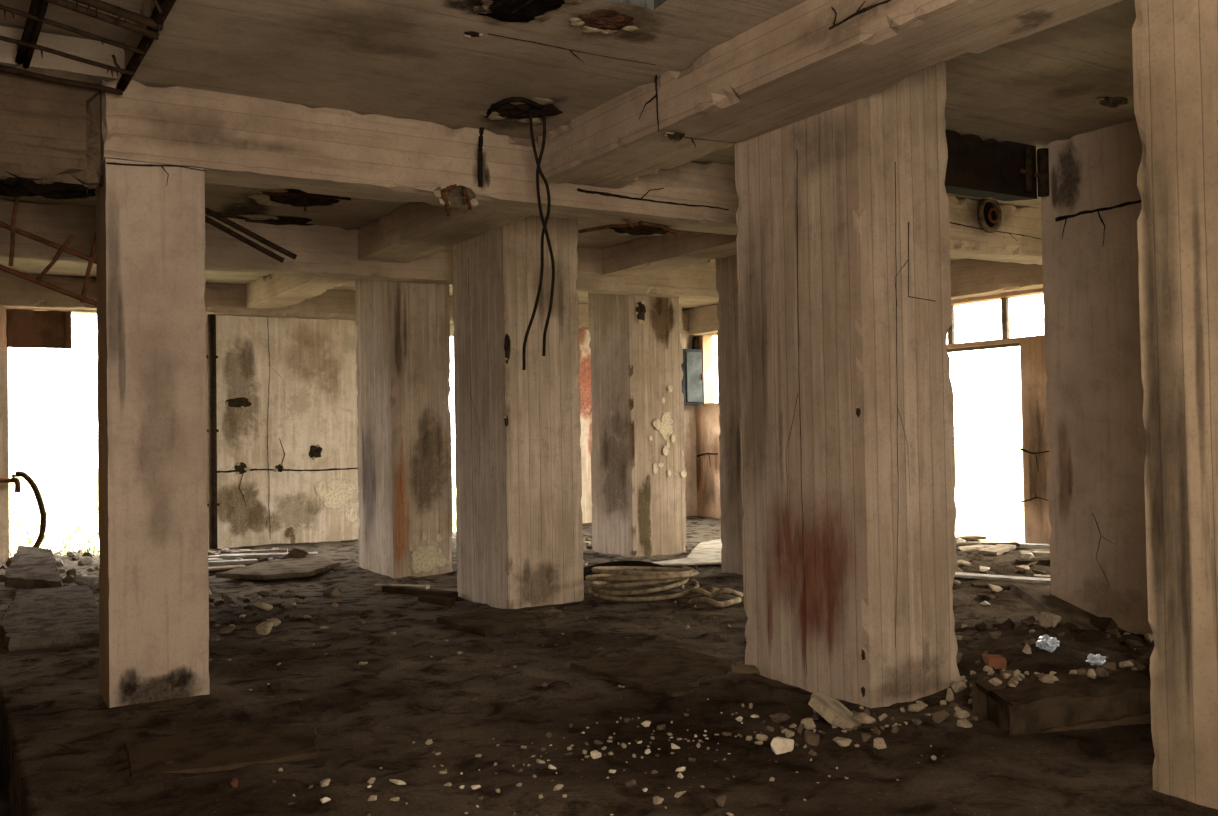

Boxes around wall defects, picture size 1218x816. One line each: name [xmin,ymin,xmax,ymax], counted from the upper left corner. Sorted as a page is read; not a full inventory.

spalling [237,188,360,226]
leakage [218,484,268,535]